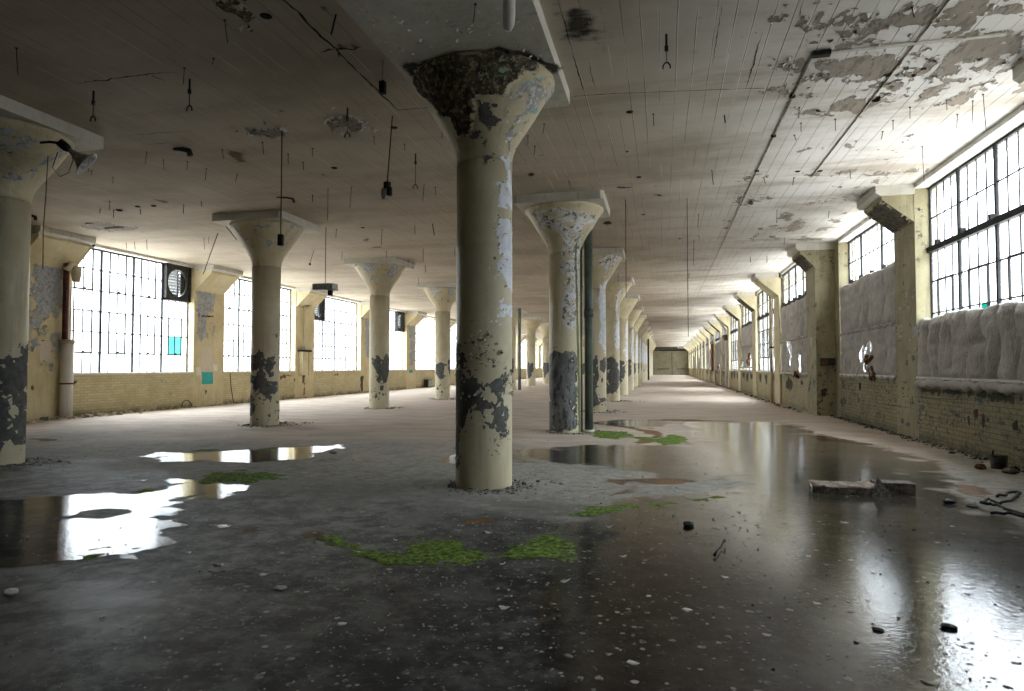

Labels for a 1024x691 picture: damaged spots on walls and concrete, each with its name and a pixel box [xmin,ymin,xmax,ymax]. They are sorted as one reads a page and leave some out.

spalling [211,0,255,32]
crack [283,0,419,110]
water stain [566,9,598,41]
peeling [759,0,1024,118]
spalling [358,10,558,473]
peeling [529,204,597,330]
peeling [0,263,63,452]
peeling [249,334,280,425]
peeling [527,255,648,433]